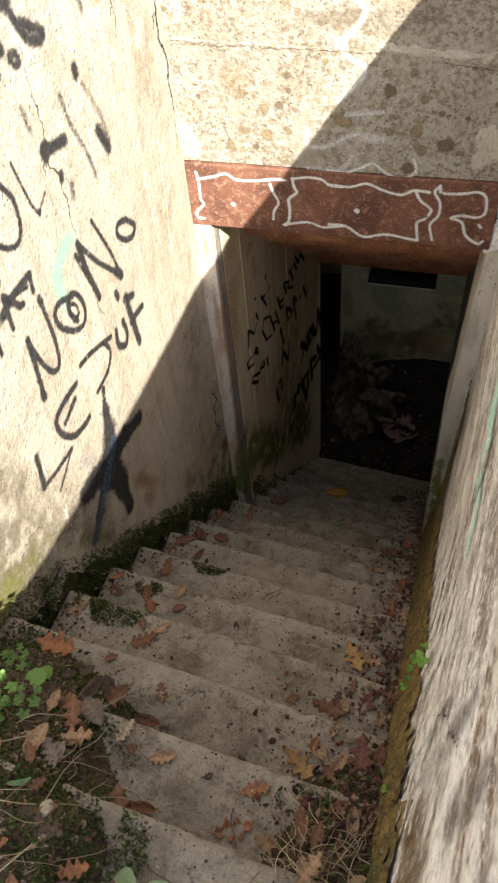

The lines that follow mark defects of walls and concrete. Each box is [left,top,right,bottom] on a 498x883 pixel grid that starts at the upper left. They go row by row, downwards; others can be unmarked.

crack [152,0,378,139]